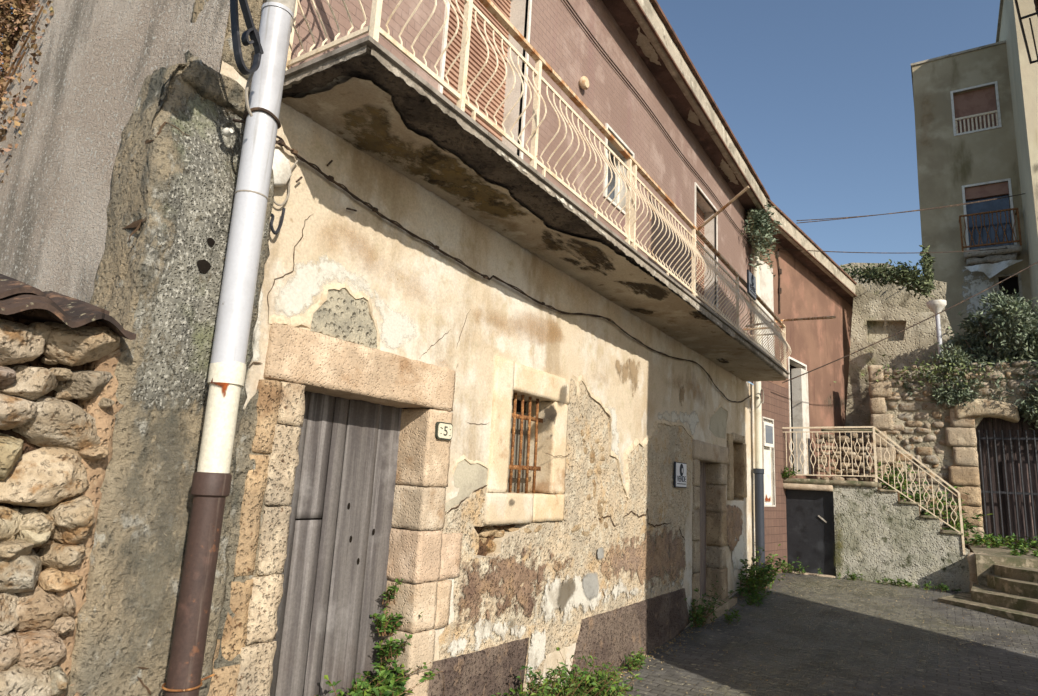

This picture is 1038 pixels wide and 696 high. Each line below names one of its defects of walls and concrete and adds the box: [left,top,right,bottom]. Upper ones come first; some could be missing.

peeling [636,27,661,65]
water stain [343,106,527,218]
spalling [282,45,735,338]
crack [267,215,311,324]
peeling [249,282,380,368]
water stain [616,359,640,392]
peeling [439,374,694,682]